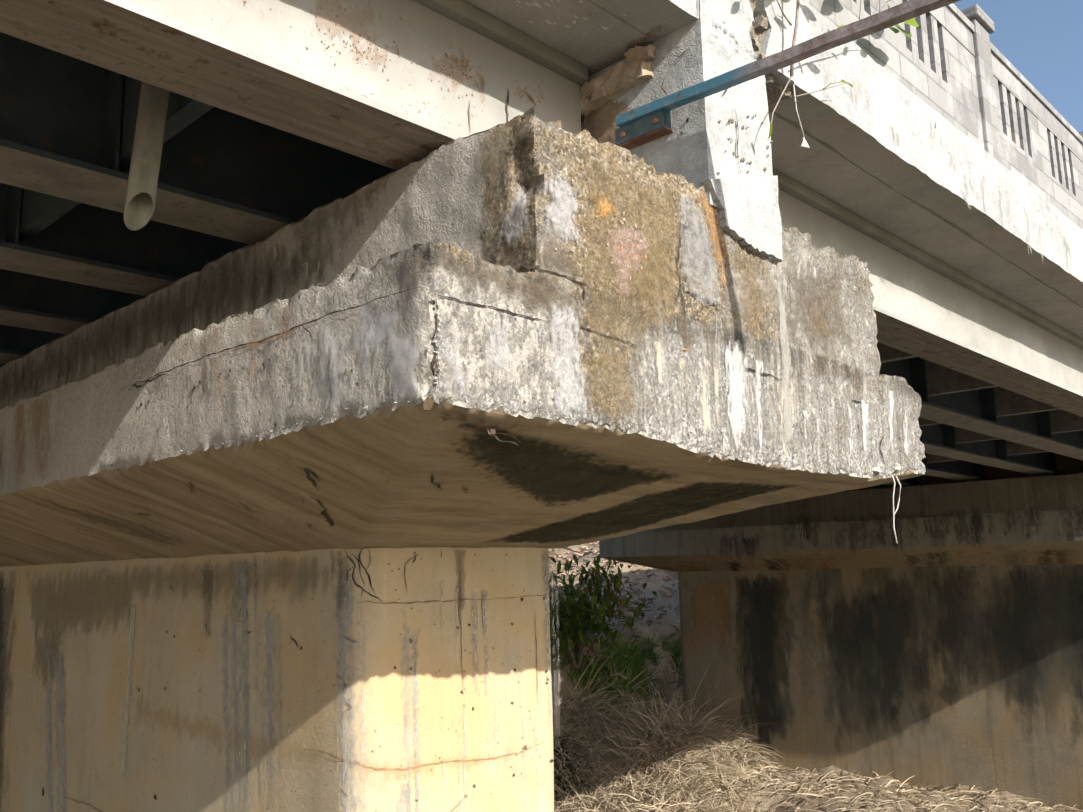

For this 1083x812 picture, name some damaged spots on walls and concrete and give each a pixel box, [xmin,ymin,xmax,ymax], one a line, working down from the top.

corrosion [316,3,418,81]
corrosion [430,43,485,132]
corrosion [506,81,544,122]
spalling [579,44,655,118]
crack [490,250,611,297]
crack [122,287,639,391]
spalling [872,436,901,476]